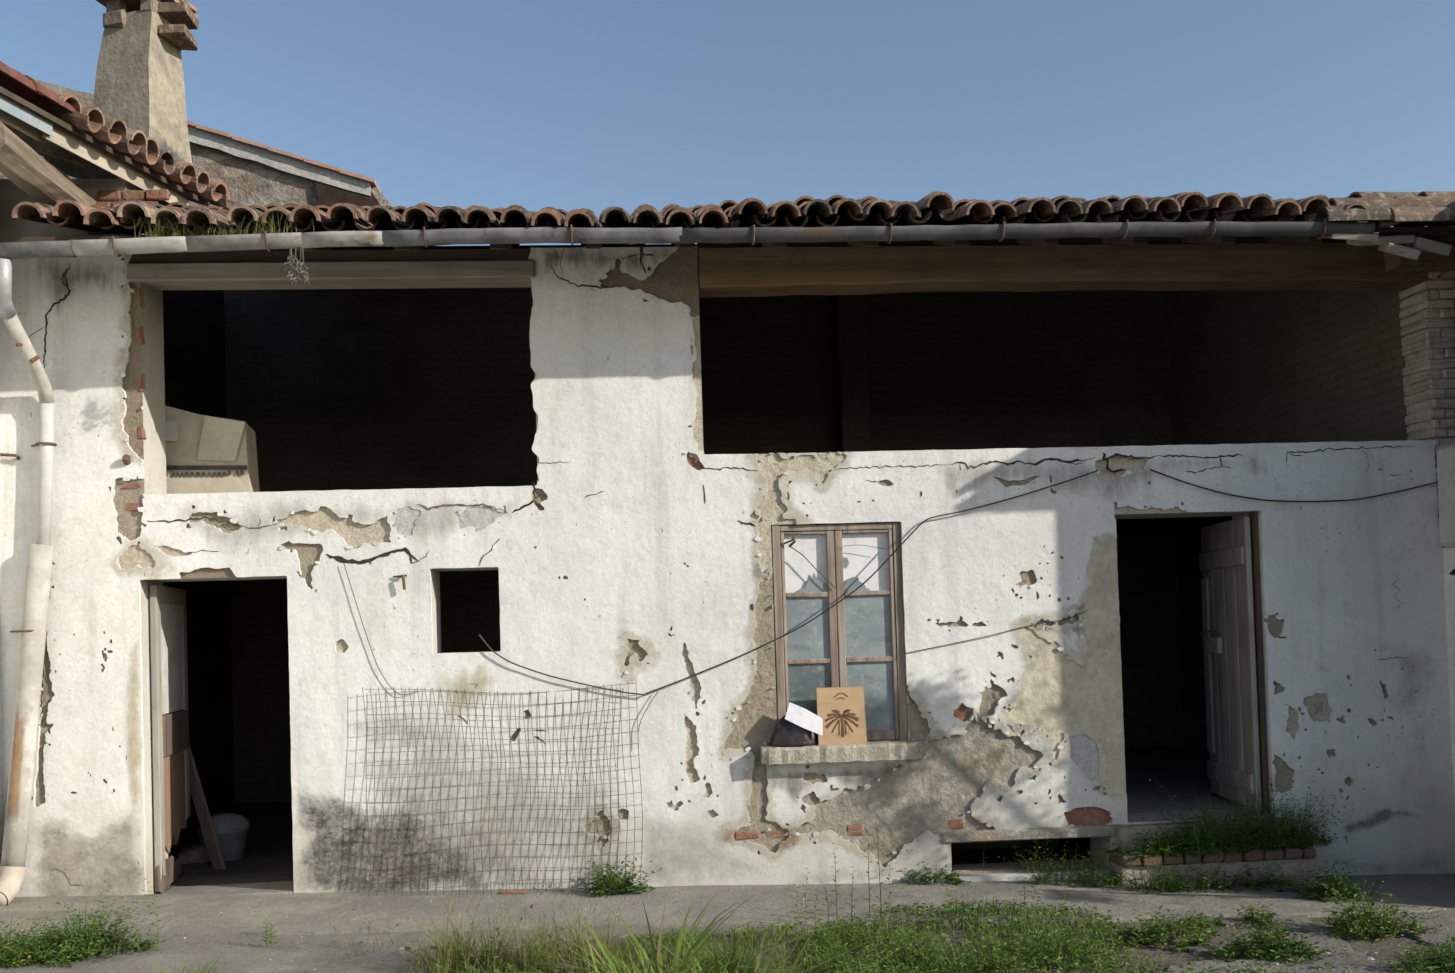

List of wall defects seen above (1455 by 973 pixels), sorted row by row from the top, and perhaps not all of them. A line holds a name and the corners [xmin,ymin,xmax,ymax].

crack [29,263,71,368]
peeling [595,248,705,470]
peeling [110,254,241,579]
peeling [532,489,548,510]
crack [831,453,1242,497]
crack [1286,444,1439,519]
peeling [273,506,421,591]
crack [326,547,430,565]
peeling [617,631,656,681]
peeling [667,452,1127,871]
peeling [32,631,57,807]
leakage [305,800,479,892]